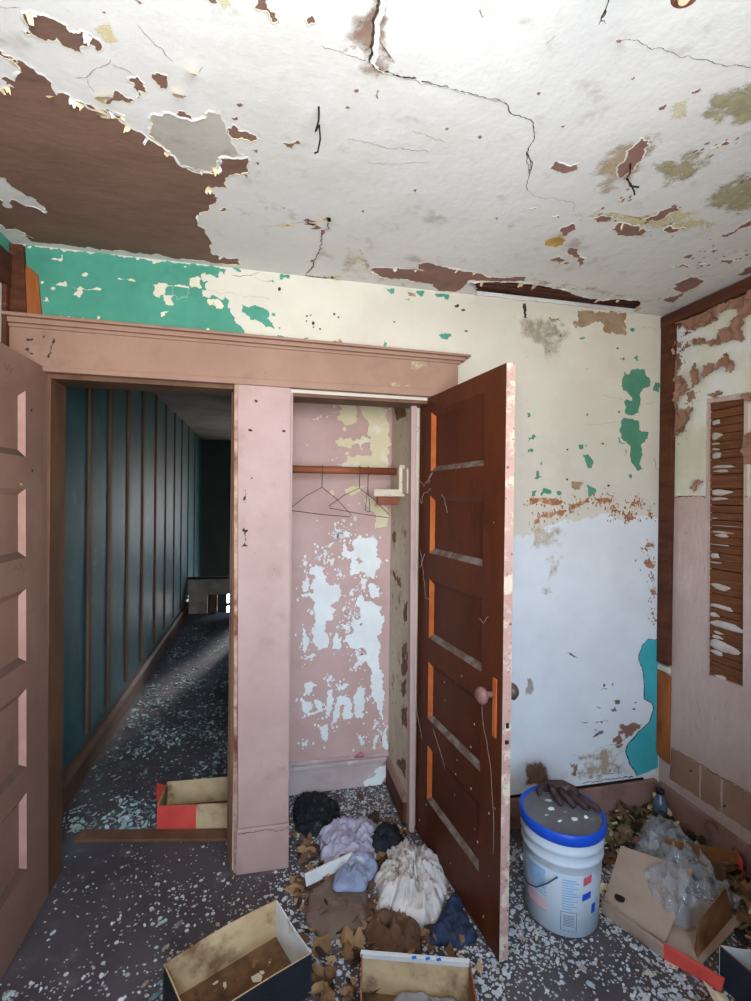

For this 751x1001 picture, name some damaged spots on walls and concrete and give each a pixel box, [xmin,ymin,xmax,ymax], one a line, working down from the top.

peeling [20,9,105,56]
crack [321,0,574,212]
crack [621,39,751,68]
peeling [0,35,284,337]
peeling [368,262,643,323]
peeling [659,220,751,304]
peeling [313,404,406,468]
peeling [566,444,594,468]
peeling [617,347,660,479]
peeling [671,289,751,436]
peeling [295,485,410,842]
flaking render [581,639,659,776]